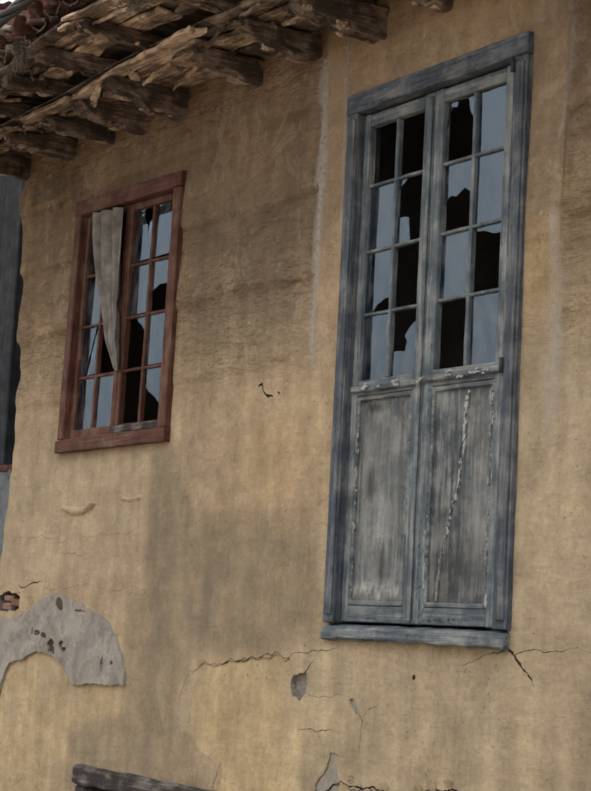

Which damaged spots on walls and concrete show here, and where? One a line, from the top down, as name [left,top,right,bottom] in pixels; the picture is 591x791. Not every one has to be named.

flaking render [0,591,126,694]
crack [188,648,335,674]
crack [462,649,582,686]
peeling [178,654,374,791]
crack [314,775,389,791]
crack [414,780,457,791]